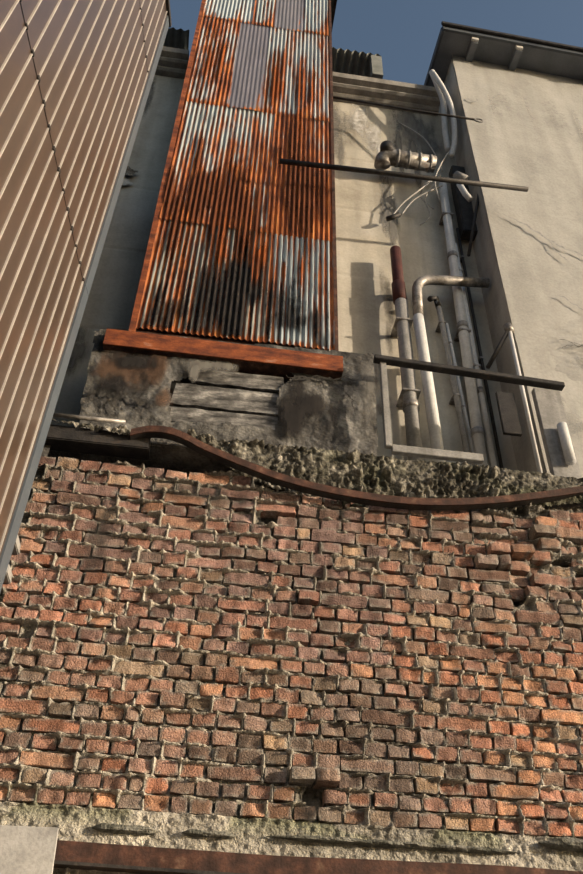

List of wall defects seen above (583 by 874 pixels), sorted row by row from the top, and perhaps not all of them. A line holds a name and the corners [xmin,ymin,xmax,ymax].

rust [197,12,230,122]
rust [160,48,331,286]